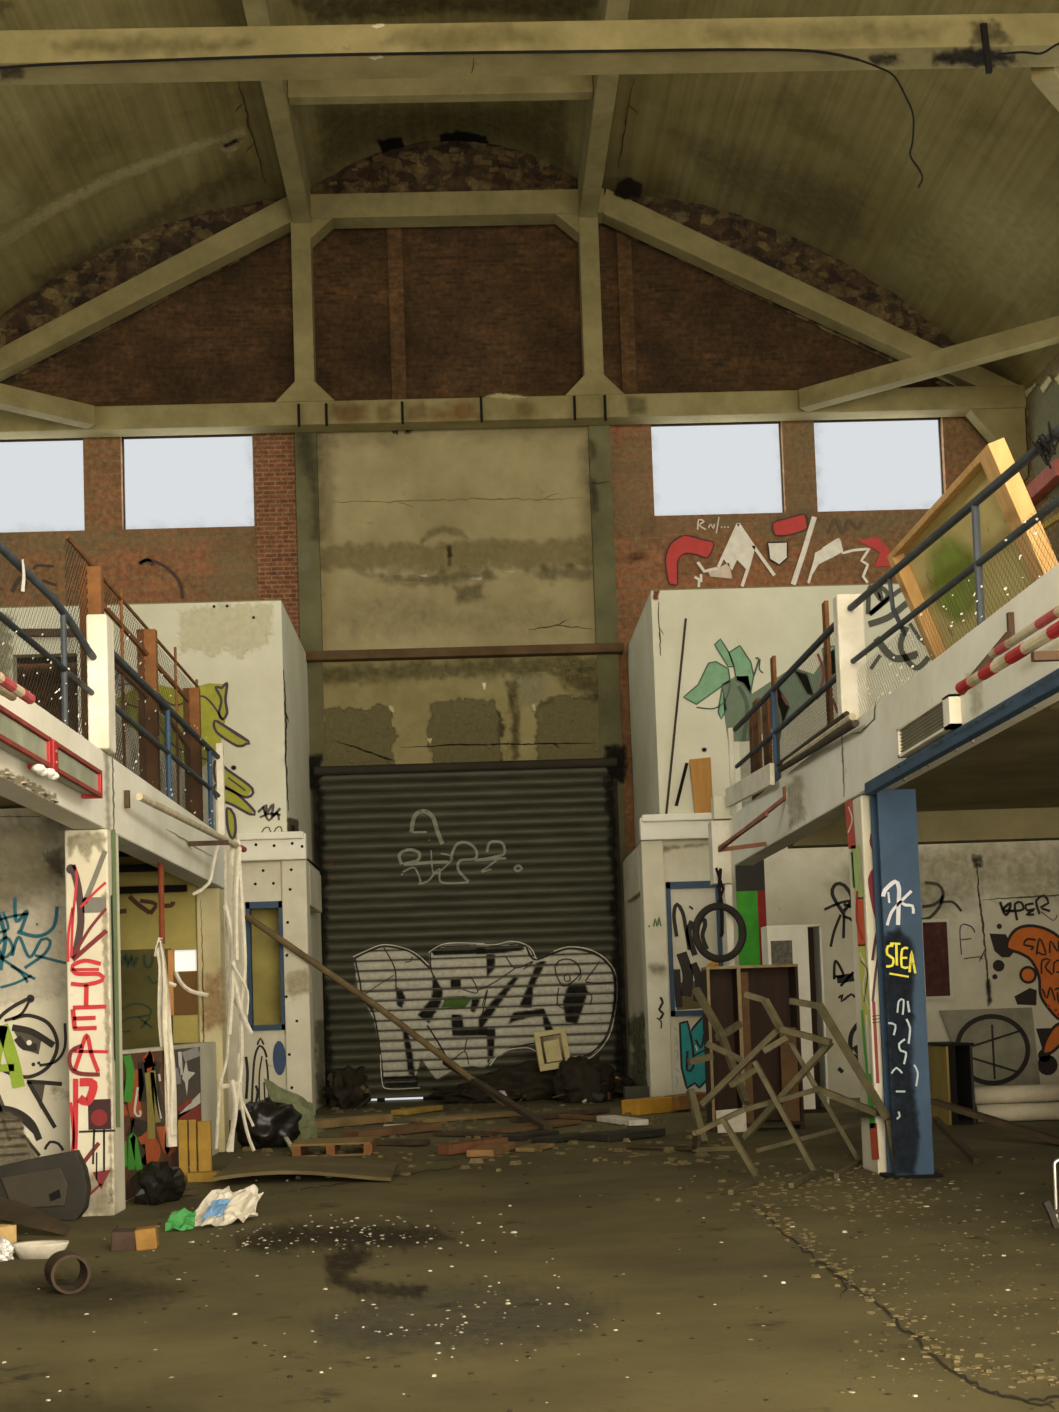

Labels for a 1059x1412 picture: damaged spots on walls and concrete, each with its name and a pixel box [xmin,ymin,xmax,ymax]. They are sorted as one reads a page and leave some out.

crack [333,481,610,507]
peeling [181,605,272,658]
water stain [323,659,598,761]
crack [751,1204,1059,1409]